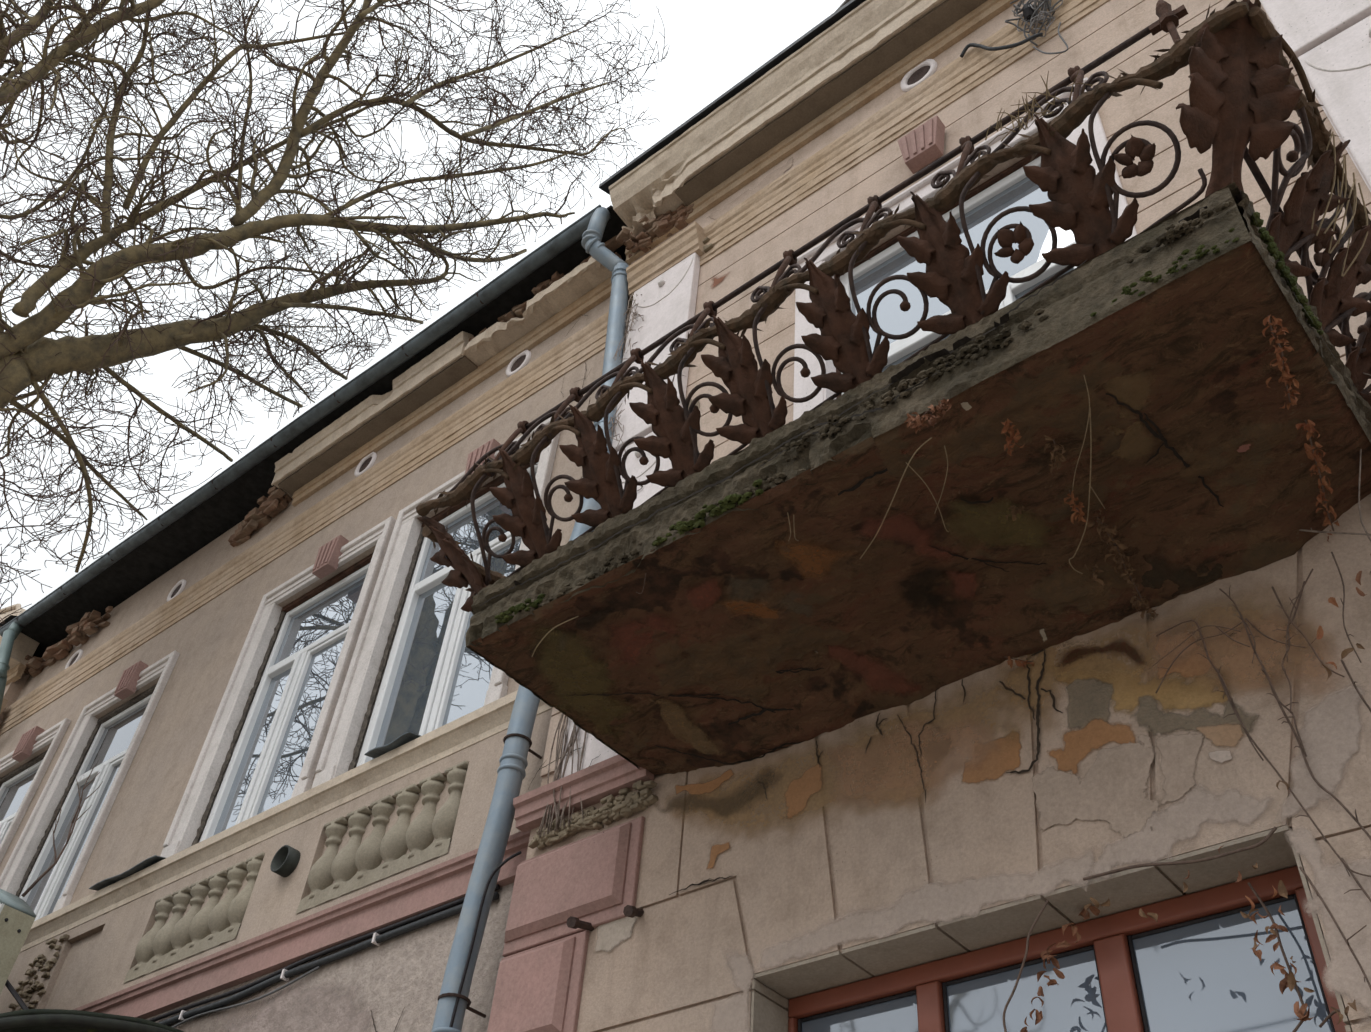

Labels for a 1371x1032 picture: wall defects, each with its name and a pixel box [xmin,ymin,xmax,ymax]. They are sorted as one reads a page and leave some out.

crack [1105,393,1224,507]
damp [538,628,628,734]
crack [566,692,823,799]
crack [865,679,966,802]
crack [999,649,1063,774]
peeling [712,641,1371,1032]